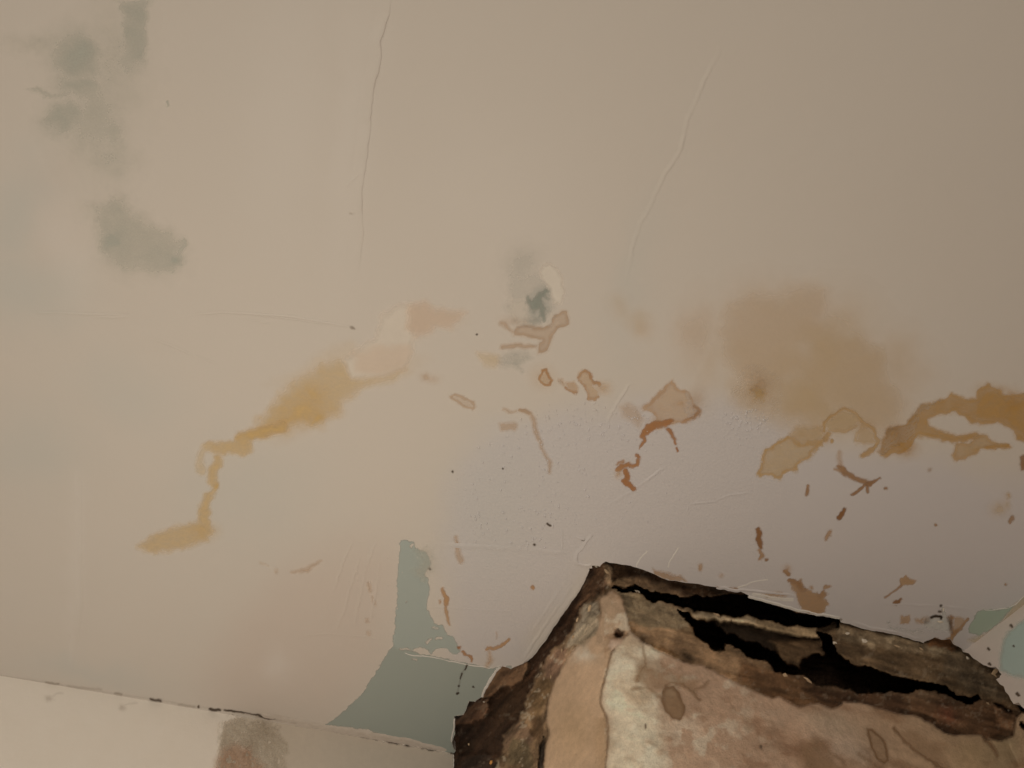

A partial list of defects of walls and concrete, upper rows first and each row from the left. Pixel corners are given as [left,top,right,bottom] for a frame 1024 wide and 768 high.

leakage [141,304,460,553]
leakage [538,368,553,386]
leakage [565,370,601,401]
leakage [729,296,1024,479]
spalling [217,540,1024,768]